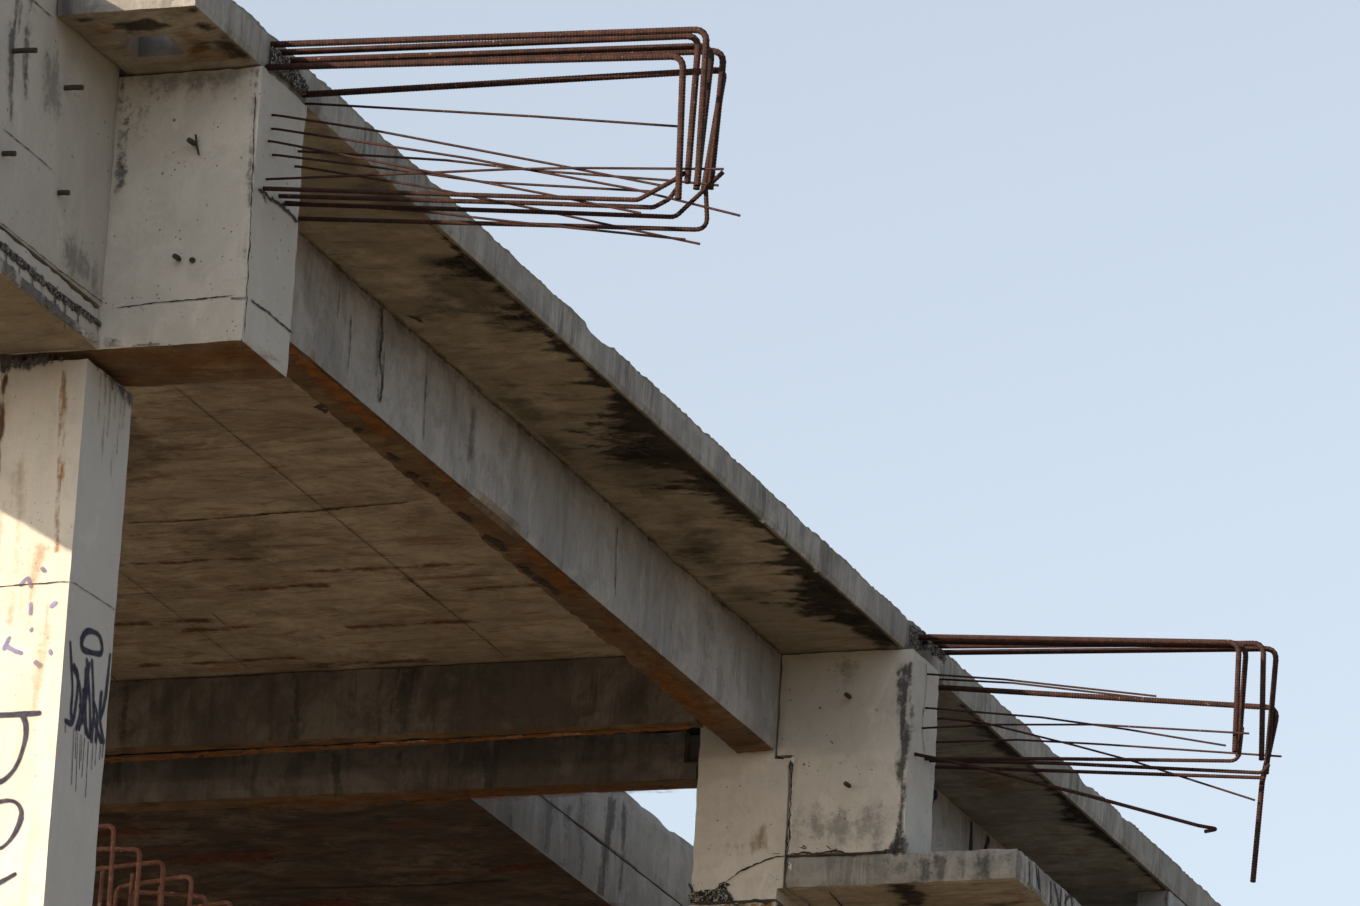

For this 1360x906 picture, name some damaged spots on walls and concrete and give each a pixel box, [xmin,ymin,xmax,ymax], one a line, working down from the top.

leakage [430,224,898,648]
leakage [889,662,914,854]